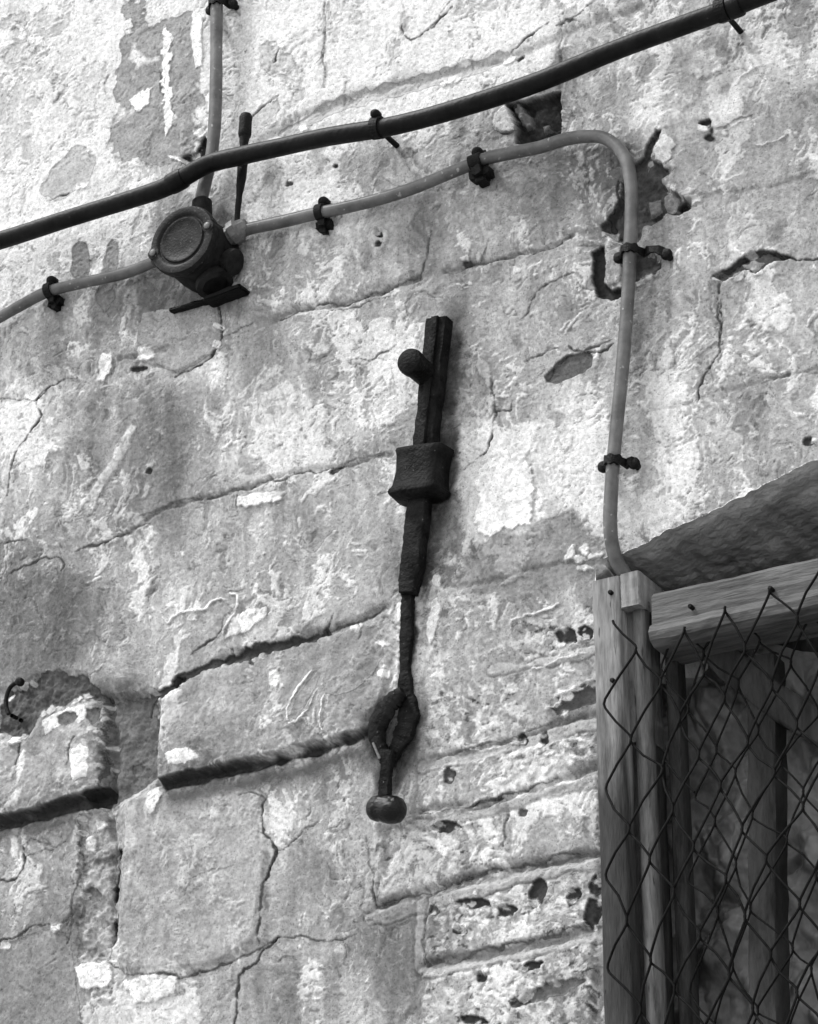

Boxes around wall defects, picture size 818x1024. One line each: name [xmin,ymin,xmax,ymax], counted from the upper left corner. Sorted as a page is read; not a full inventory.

spalling [492,94,562,144]
spalling [592,179,625,301]
spalling [635,109,702,286]
spalling [545,344,612,384]
crack [698,292,723,400]
crack [6,452,385,574]
crack [158,606,386,699]
peeling [0,670,177,1024]
crack [114,732,368,1024]
spalling [429,878,547,940]
spalling [562,874,602,931]